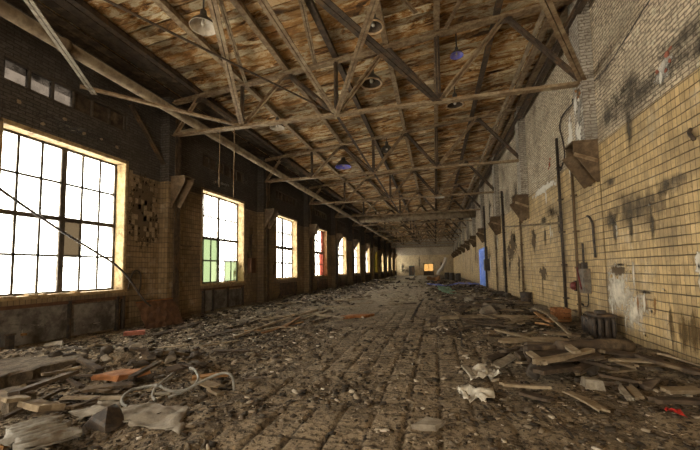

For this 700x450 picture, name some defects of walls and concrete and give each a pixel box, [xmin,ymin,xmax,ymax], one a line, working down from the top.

peeling [653,46,673,84]
spalling [128,170,159,249]
spalling [610,263,631,279]